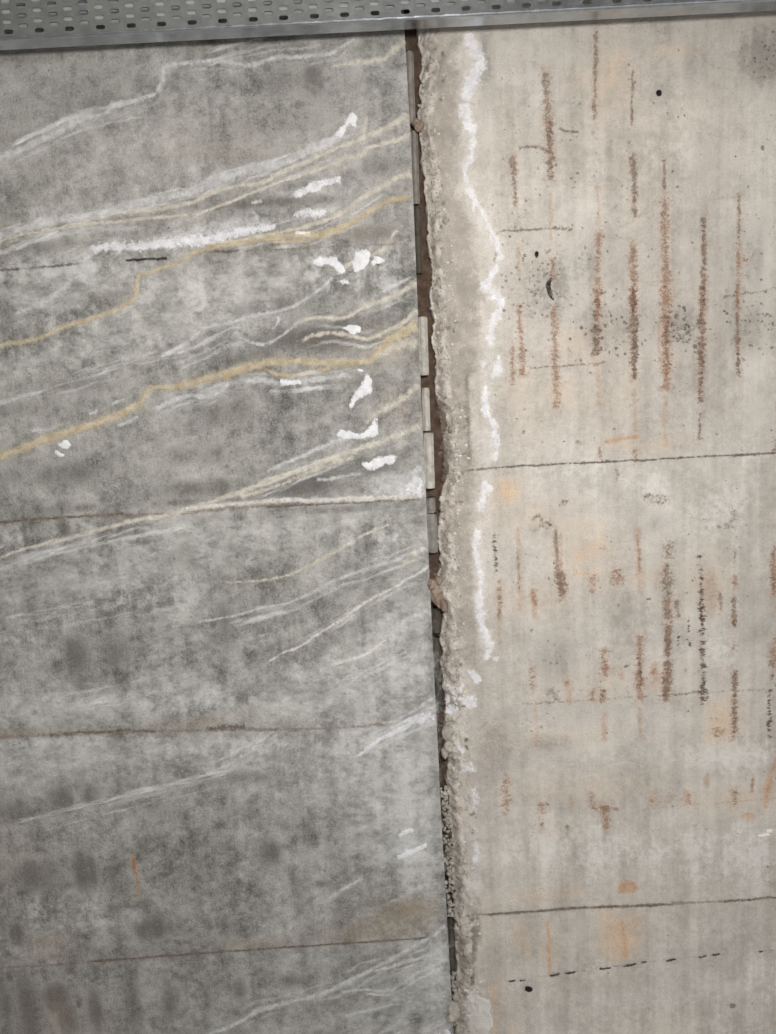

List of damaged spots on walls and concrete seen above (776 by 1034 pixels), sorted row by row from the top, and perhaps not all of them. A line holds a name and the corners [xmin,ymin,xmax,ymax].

rust [509,73,578,206]
leakage [431,33,504,472]
rust [511,155,680,407]
rust [691,218,708,440]
rust [724,194,767,375]
leakage [1,425,420,558]
leakage [357,698,435,756]
leakage [446,481,498,714]
rust [548,530,568,598]
rust [625,542,709,705]
rust [712,671,739,737]
rust [766,638,776,737]